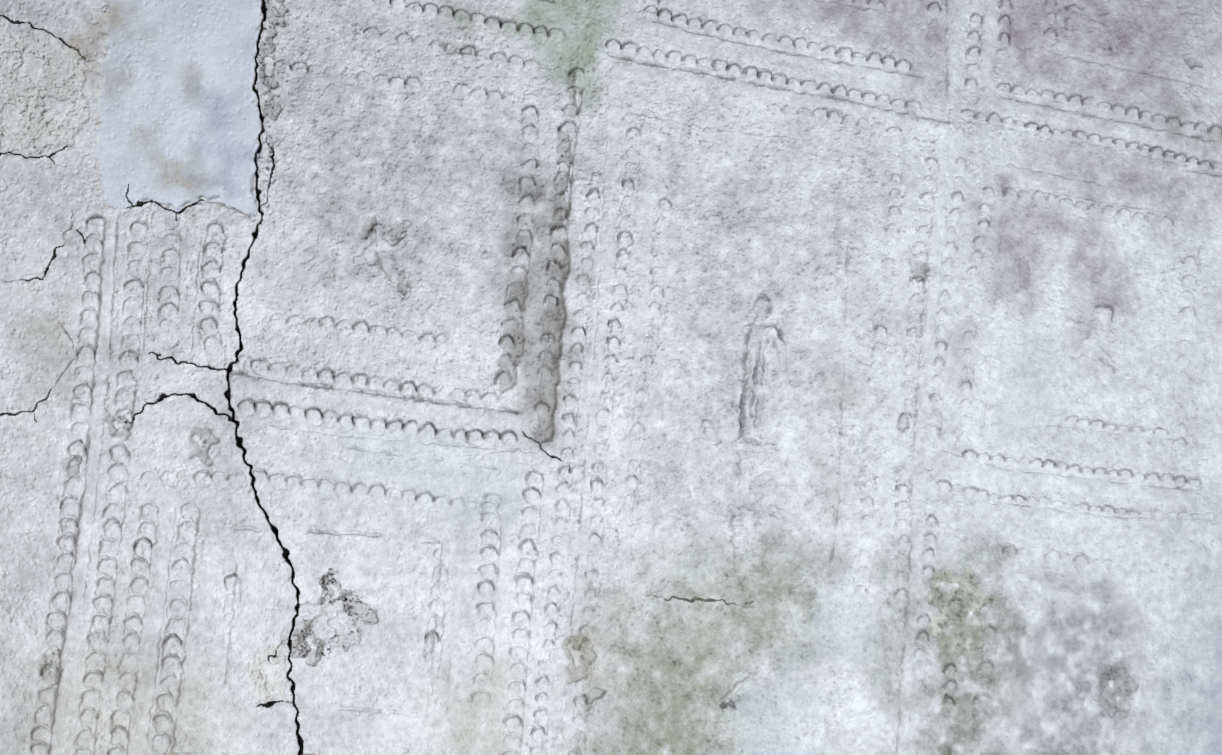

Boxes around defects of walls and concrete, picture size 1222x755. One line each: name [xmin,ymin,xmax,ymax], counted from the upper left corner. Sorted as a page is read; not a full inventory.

crack [0,15,85,60]
crack [0,145,68,164]
crack [19,229,86,282]
crack [126,0,304,755]
crack [0,388,52,422]